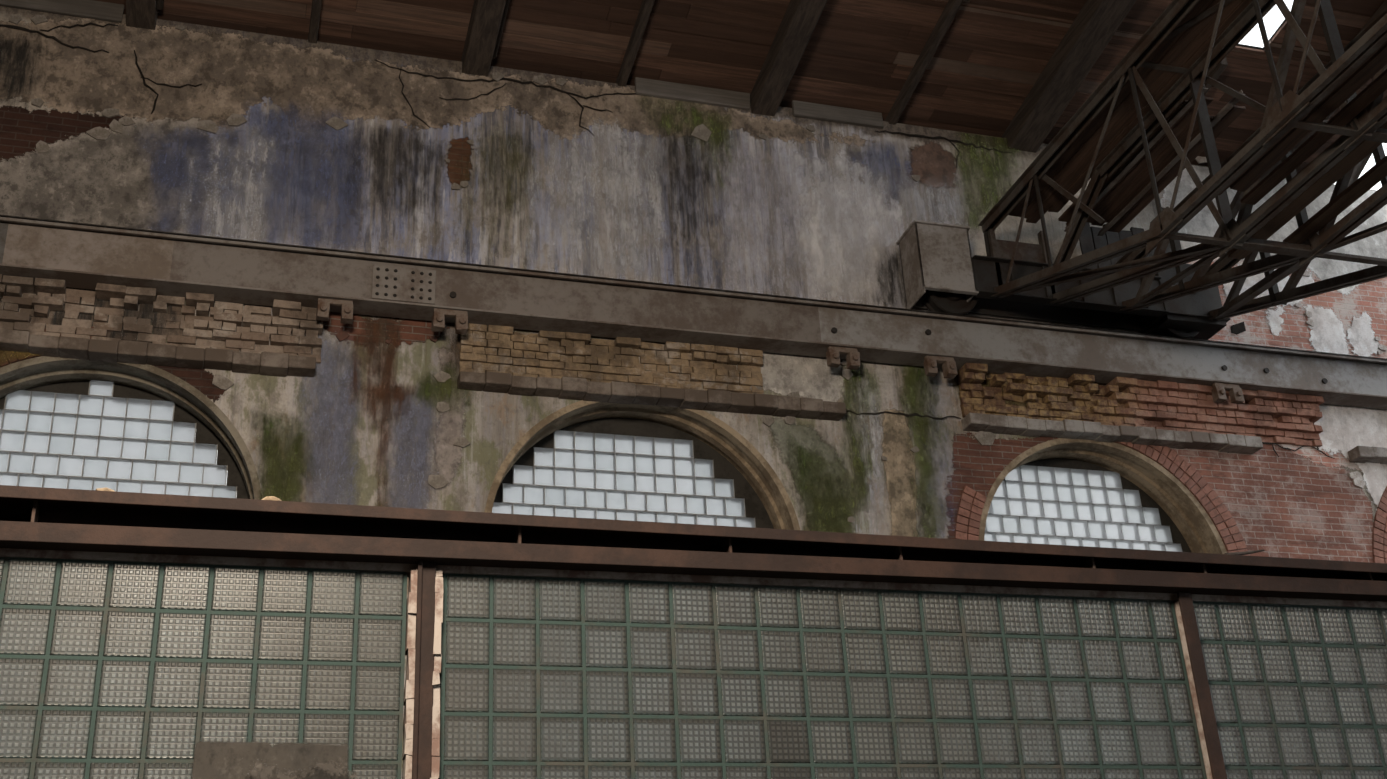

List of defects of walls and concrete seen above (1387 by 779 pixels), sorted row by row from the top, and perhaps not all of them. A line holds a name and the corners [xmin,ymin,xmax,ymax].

crack [0,22,202,114]
leakage [146,109,442,247]
flaking render [0,15,875,233]
crack [375,60,636,136]
leakage [484,115,1010,305]
flaking render [1160,156,1210,210]
flaking render [1178,178,1387,359]
flaking render [152,365,234,402]
leakage [826,376,880,533]
flaking render [944,431,1058,539]
flaking render [1125,404,1387,563]